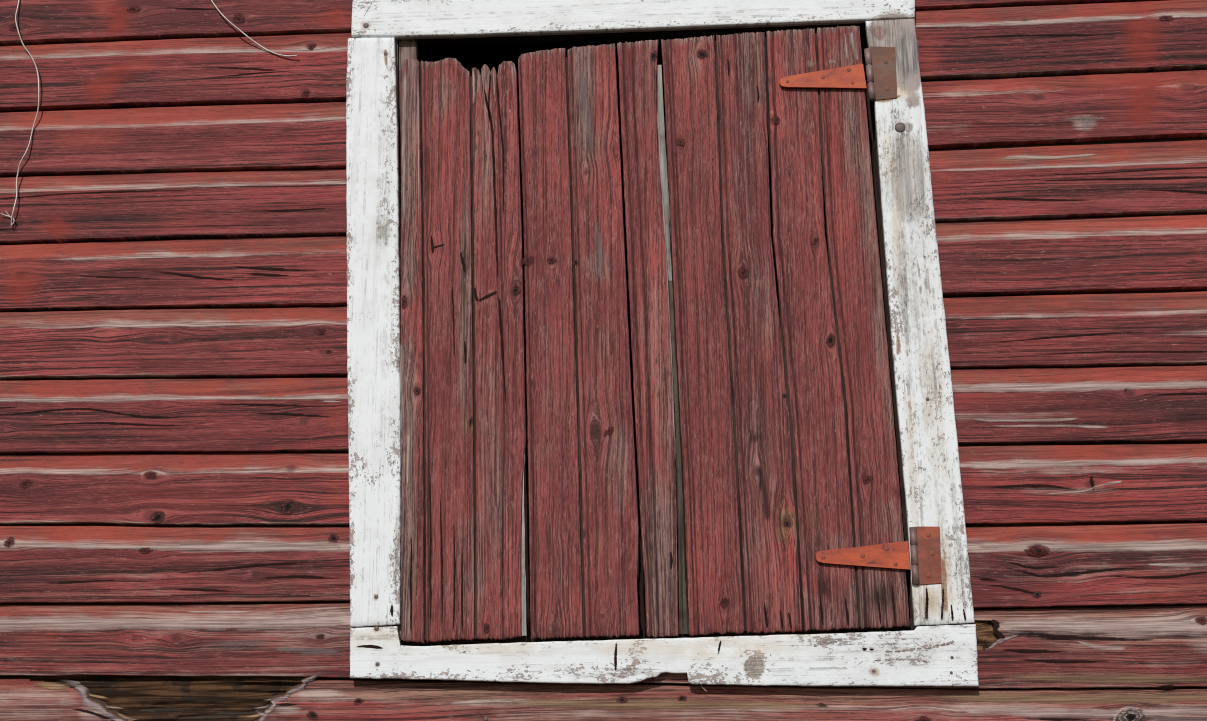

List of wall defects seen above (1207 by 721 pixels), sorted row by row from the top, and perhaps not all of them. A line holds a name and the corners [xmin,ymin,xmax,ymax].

crack [431,74,506,402]